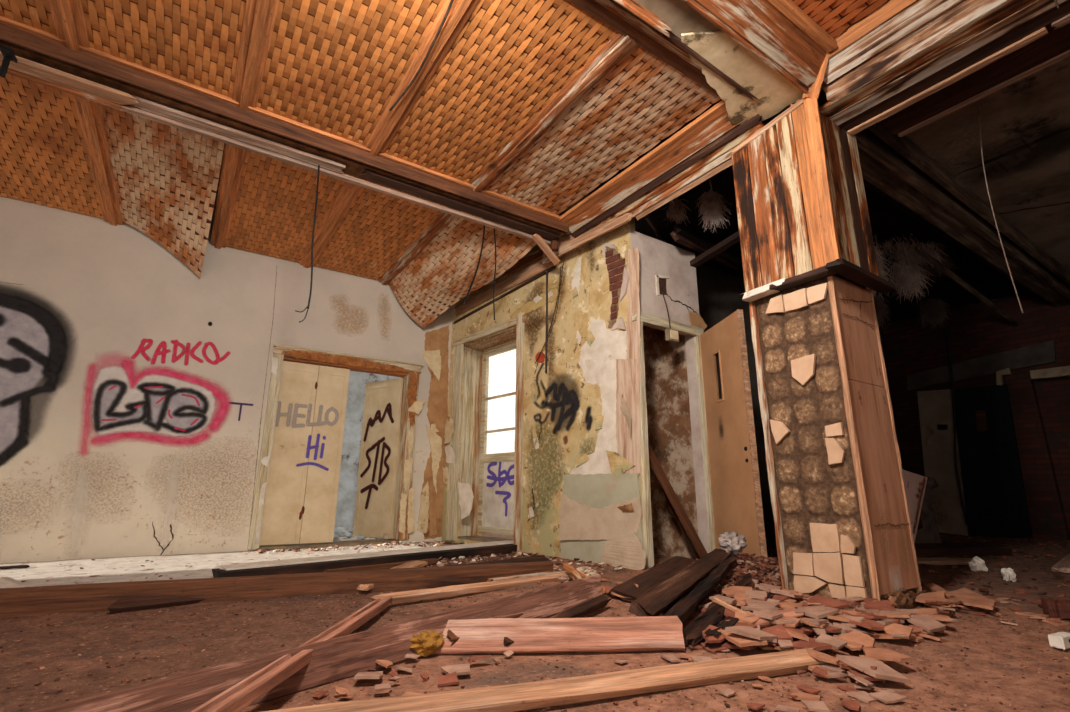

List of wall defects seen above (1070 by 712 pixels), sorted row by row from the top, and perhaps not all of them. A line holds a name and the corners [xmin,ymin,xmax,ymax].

crack [152,522,174,555]
peeling [271,325,474,540]
peeling [571,242,641,477]